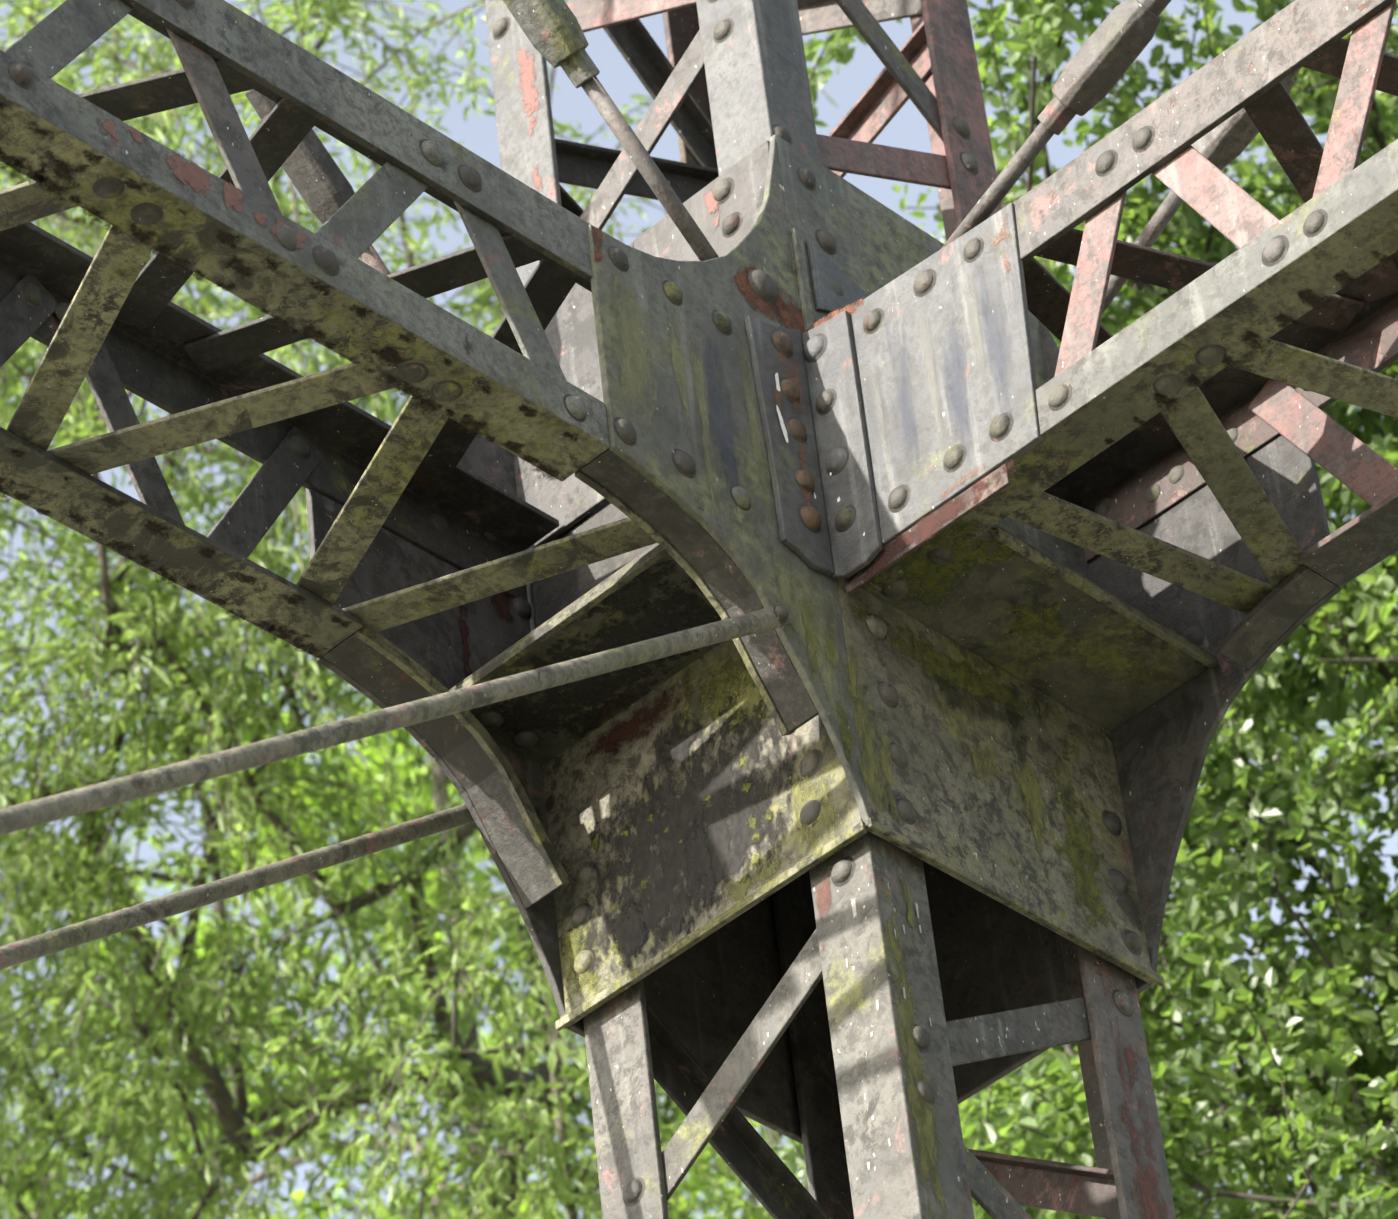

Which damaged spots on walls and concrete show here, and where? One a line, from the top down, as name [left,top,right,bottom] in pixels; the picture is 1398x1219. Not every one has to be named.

corrosion [0,121,281,291]
corrosion [734,266,863,333]
corrosion [260,306,558,480]
damp [516,560,722,672]
damp [484,649,697,739]
corrosion [583,674,690,763]
damp [837,701,852,768]
damp [925,673,1046,853]
damp [579,697,805,979]